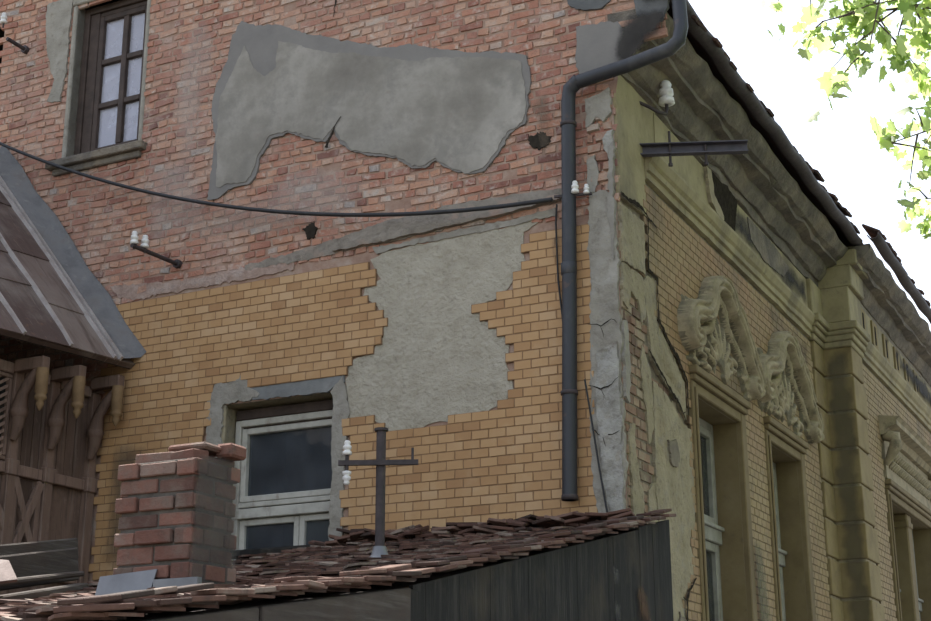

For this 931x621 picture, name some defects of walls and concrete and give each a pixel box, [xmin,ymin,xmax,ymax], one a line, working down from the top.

peeling [567,0,611,11]
peeling [634,0,670,22]
peeling [575,21,622,74]
peeling [207,21,532,200]
flaking render [308,87,658,546]
crack [683,577,697,621]